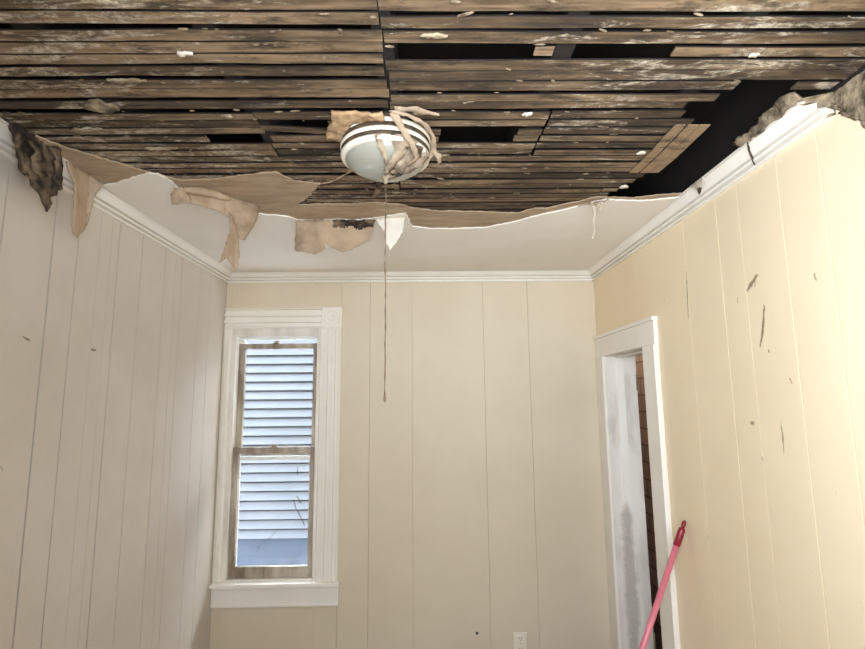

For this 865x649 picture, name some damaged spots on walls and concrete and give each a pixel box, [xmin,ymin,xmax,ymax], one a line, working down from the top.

flaking render [831,70,865,129]
damp [8,123,63,212]
peeling [690,178,704,194]
peeling [374,218,405,251]